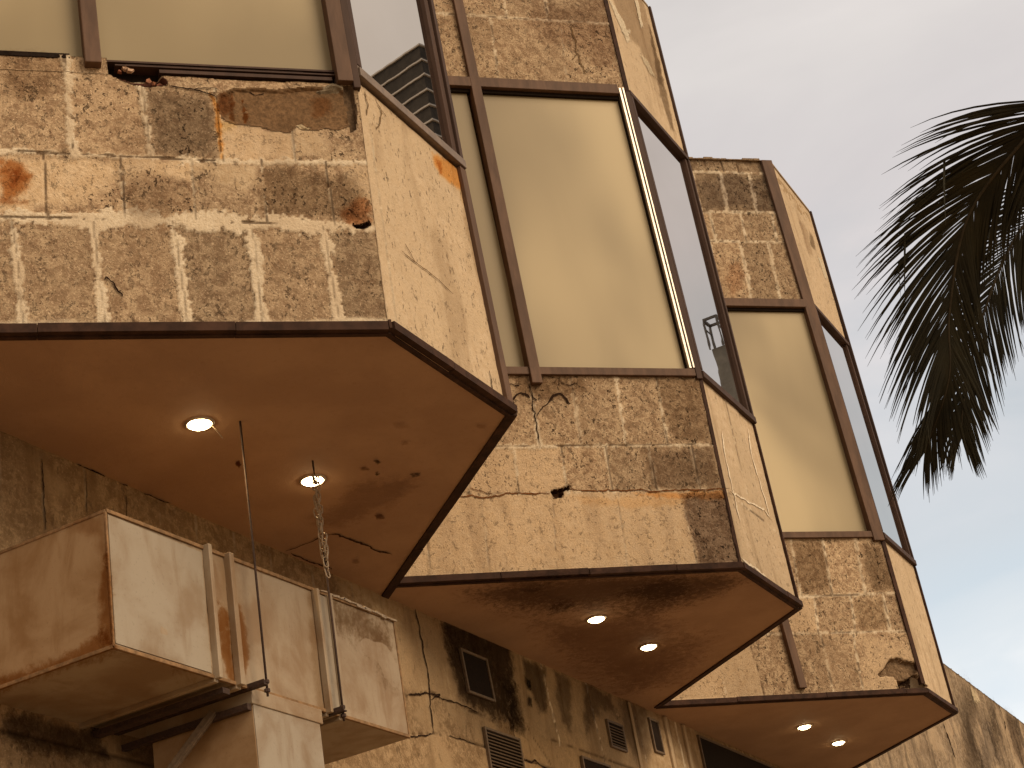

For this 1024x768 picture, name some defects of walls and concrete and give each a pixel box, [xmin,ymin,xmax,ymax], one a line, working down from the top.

spalling [113,66,168,88]
peeling [216,83,358,133]
crack [489,371,575,443]
crack [460,427,773,521]
crack [287,534,390,569]
crack [409,610,478,744]
spalling [878,657,928,689]